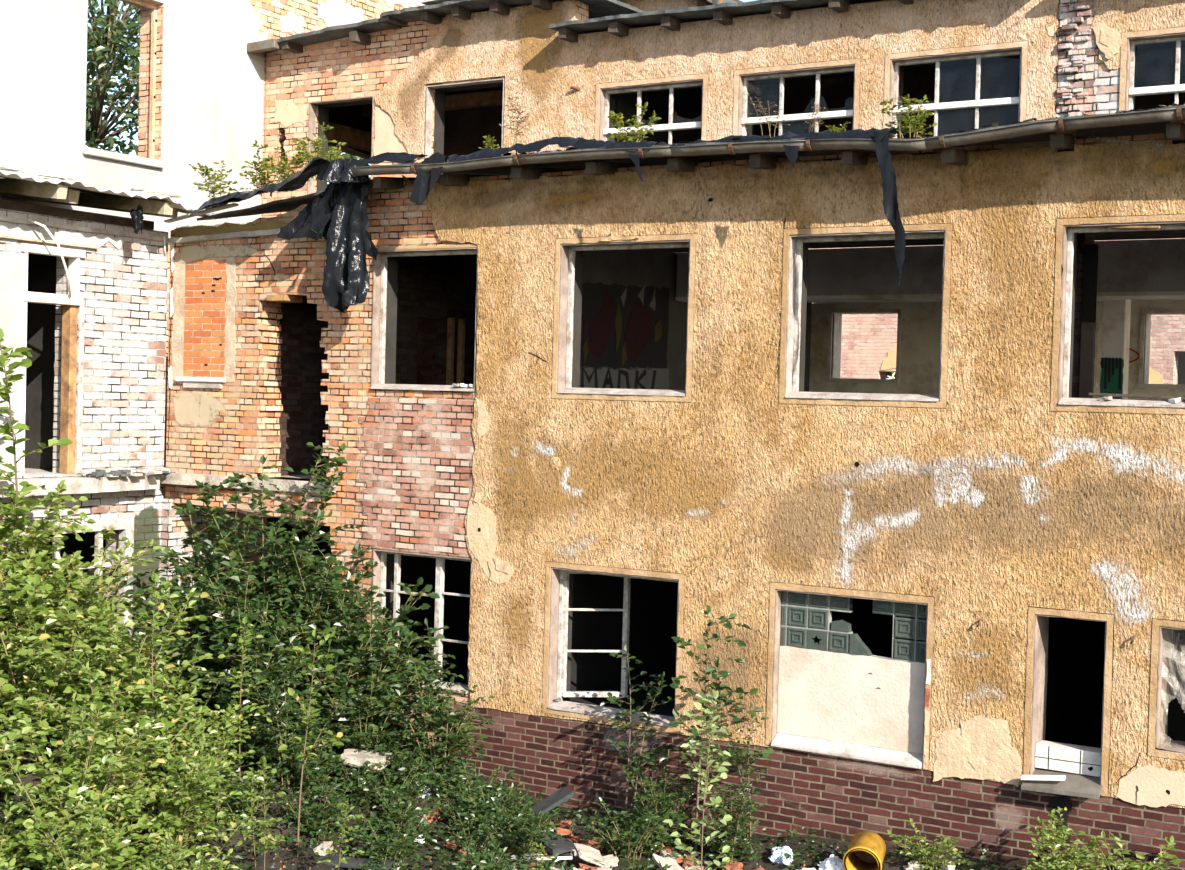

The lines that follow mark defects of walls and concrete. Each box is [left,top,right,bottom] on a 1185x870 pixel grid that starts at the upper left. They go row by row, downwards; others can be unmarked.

peeling [1047,0,1121,117]
peeling [373,106,424,163]
peeling [467,491,514,584]
peeling [924,659,1022,787]
peeling [1116,764,1185,807]